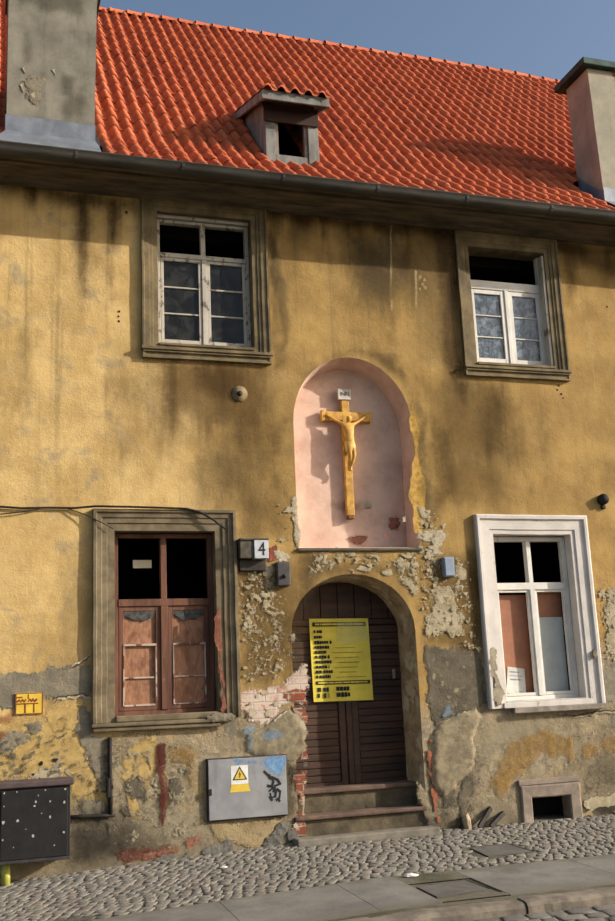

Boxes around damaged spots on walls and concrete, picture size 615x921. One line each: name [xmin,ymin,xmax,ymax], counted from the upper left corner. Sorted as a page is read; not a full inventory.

damp [25,187,125,247]
flaking render [0,705,235,865]
peeling [214,607,239,740]
flaking render [238,496,311,725]
peeling [306,507,505,709]
peeling [426,714,489,827]
crack [557,700,615,718]
peeling [592,573,615,664]